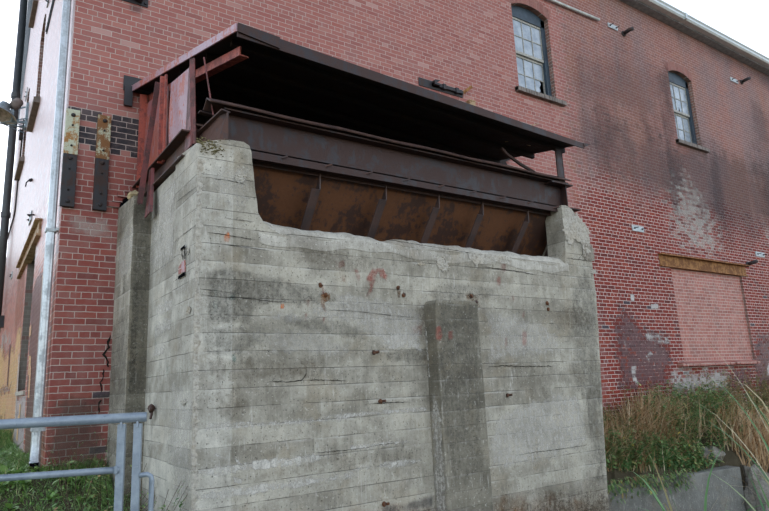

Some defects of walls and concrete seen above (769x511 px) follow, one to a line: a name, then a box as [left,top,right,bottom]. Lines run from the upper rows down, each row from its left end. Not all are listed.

spalling [259,221,569,273]
spalling [562,208,597,274]
peeling [0,273,45,419]
crack [98,335,111,412]